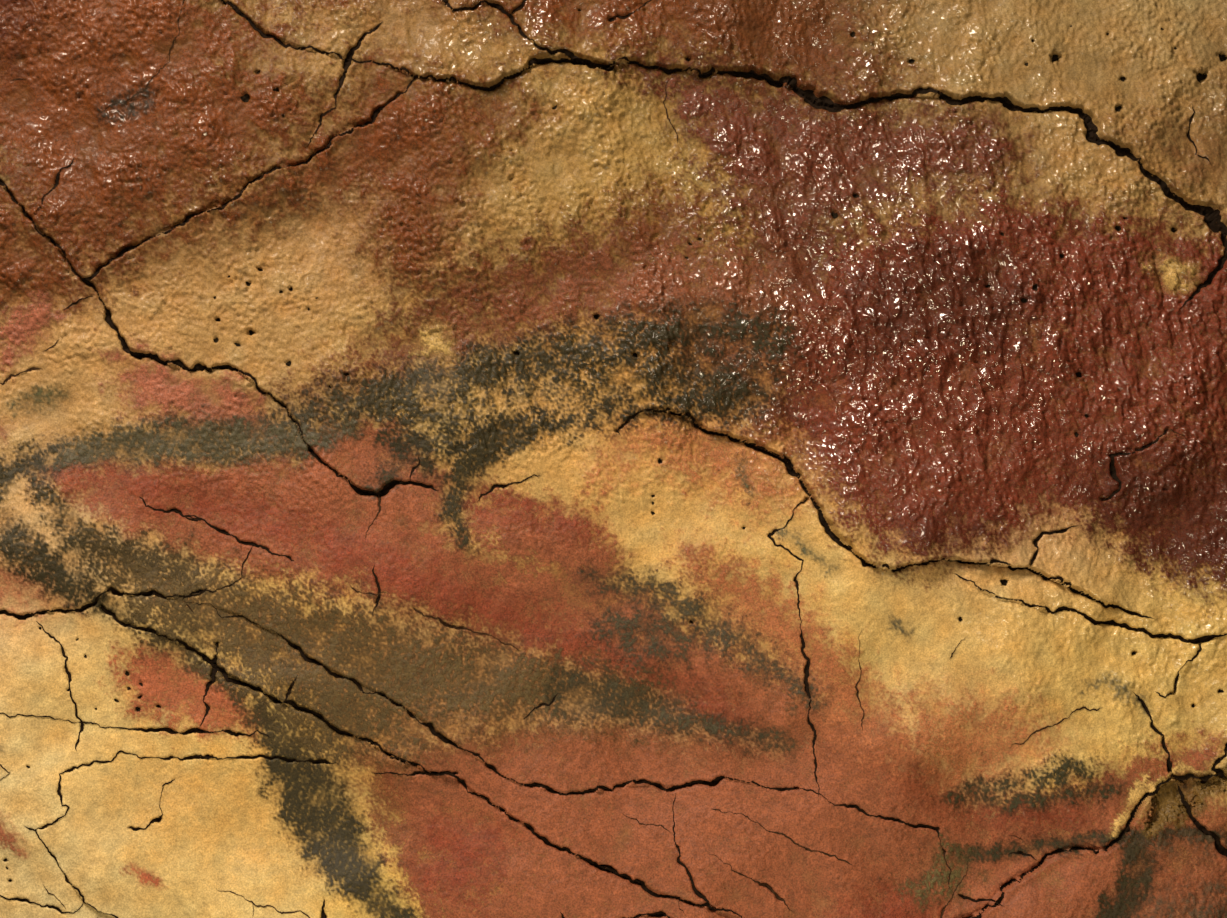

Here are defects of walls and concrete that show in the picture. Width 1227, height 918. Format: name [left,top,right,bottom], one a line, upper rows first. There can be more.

crack [0,0,1227,538]
crack [0,407,1227,918]